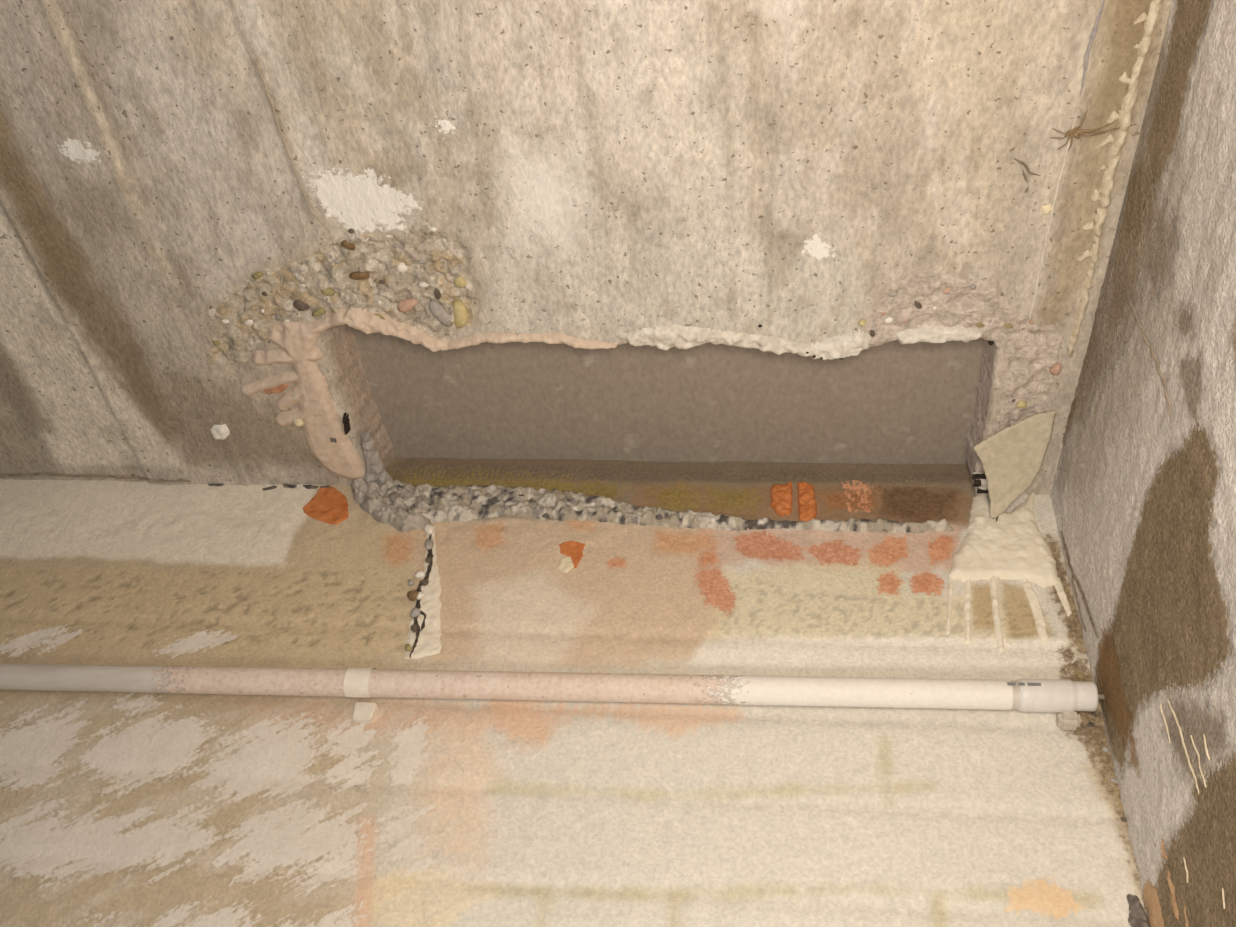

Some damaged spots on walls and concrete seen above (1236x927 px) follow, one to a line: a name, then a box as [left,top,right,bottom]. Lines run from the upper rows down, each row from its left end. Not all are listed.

spalling [205,219,478,366]
damp [1062,0,1213,445]
spalling [263,384,289,394]
spalling [615,270,1064,521]
flaking render [302,486,349,525]
rust [815,479,964,524]
crack [404,524,442,659]
damp [1093,299,1236,927]